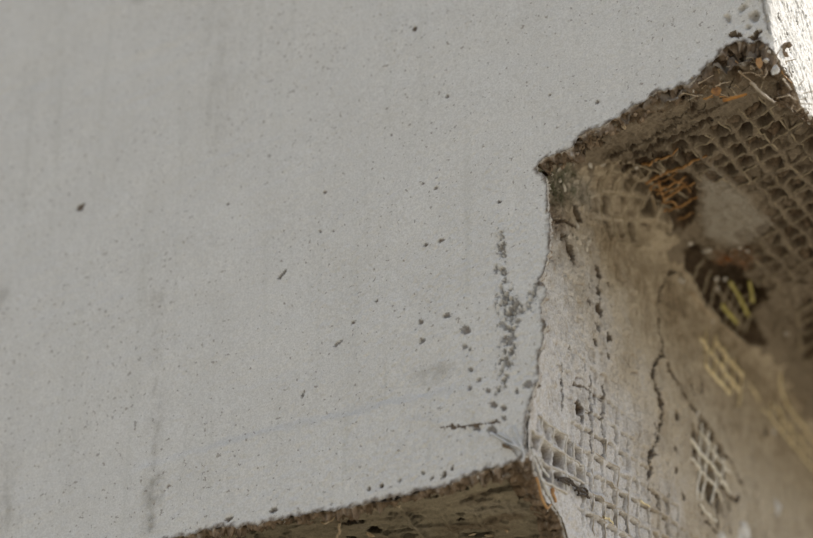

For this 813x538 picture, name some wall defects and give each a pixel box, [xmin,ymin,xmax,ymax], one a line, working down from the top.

flaking render [174,32,813,538]
crack [647,270,746,534]